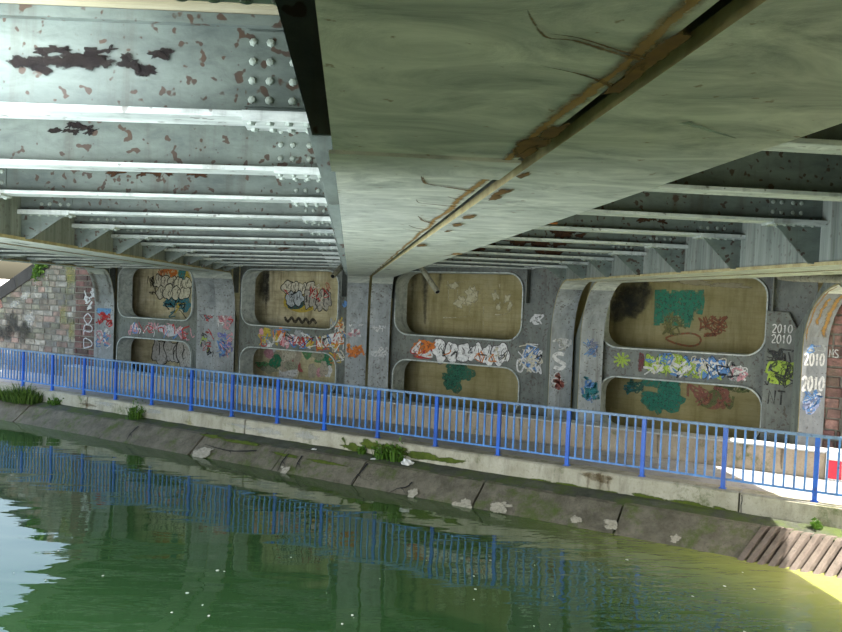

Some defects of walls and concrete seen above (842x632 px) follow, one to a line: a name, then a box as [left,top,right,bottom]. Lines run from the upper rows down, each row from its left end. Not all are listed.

corrosion [504,0,702,160]
corrosion [370,176,489,276]
corrosion [444,189,514,232]
corrosion [471,230,587,256]